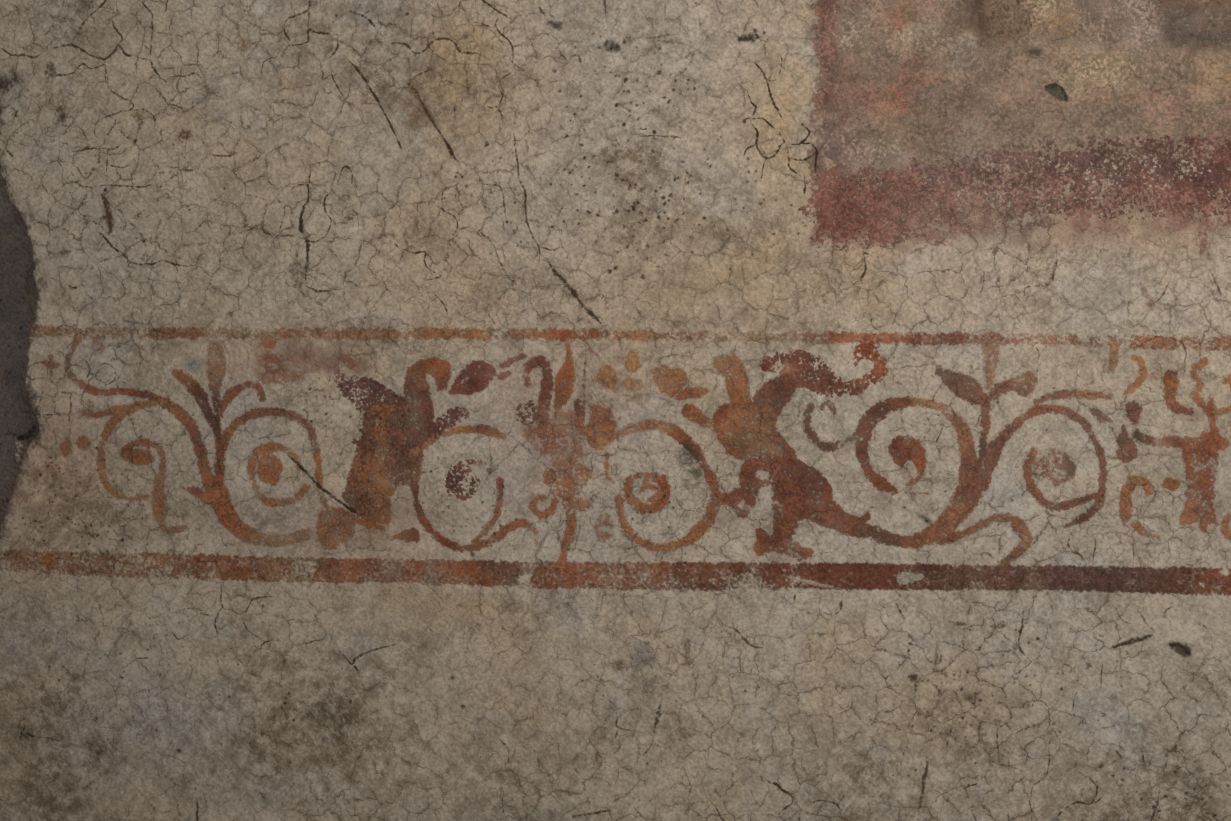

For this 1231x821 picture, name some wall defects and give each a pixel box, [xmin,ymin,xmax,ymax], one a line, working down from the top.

crack [2,0,231,171]
crack [261,1,344,96]
crack [72,146,151,188]
crack [359,0,556,281]
crack [744,58,818,193]
crack [96,230,188,267]
crack [239,165,447,311]
crack [36,361,115,419]
crack [165,589,272,646]
crack [345,644,395,670]
crack [760,776,842,820]
crack [1029,742,1102,816]